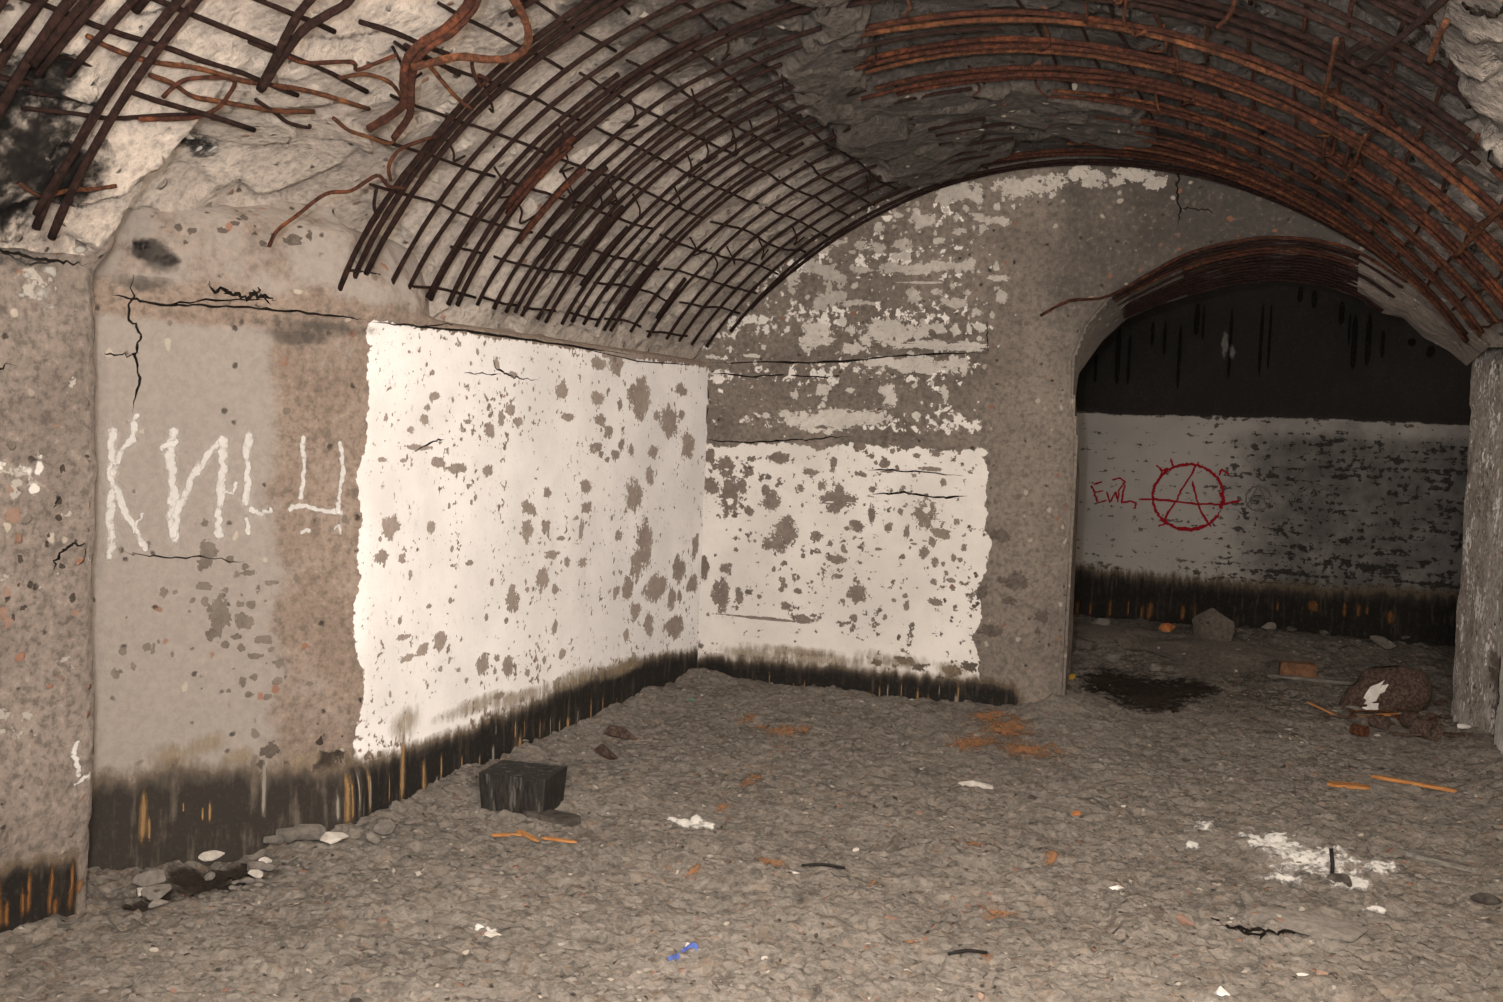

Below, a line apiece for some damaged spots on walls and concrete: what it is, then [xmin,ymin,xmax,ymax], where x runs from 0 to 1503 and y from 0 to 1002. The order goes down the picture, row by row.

crack [104,274,988,444]
spalling [0,0,1503,662]
crack [868,469,963,499]
peeling [110,518,298,701]
peeling [396,479,593,703]
spalling [871,634,993,678]
damp [1073,564,1459,646]
spalling [1478,649,1501,720]
damp [0,647,1021,933]